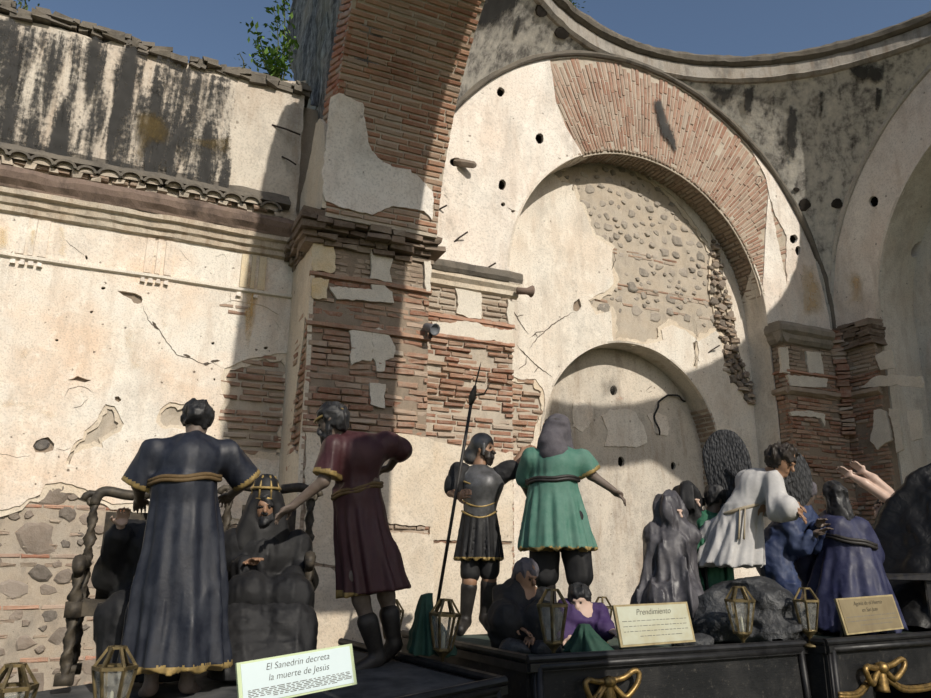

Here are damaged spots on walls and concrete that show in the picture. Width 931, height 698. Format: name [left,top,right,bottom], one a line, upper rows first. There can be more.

water stain [478,0,521,36]
water stain [0,18,234,188]
peeling [322,93,434,221]
water stain [744,87,753,115]
water stain [787,106,797,159]
water stain [850,64,884,110]
flaking render [553,162,756,404]
crack [143,307,220,365]
flaking render [214,347,287,461]
peeling [348,328,396,409]
crack [514,312,572,377]
flaking render [0,482,149,697]